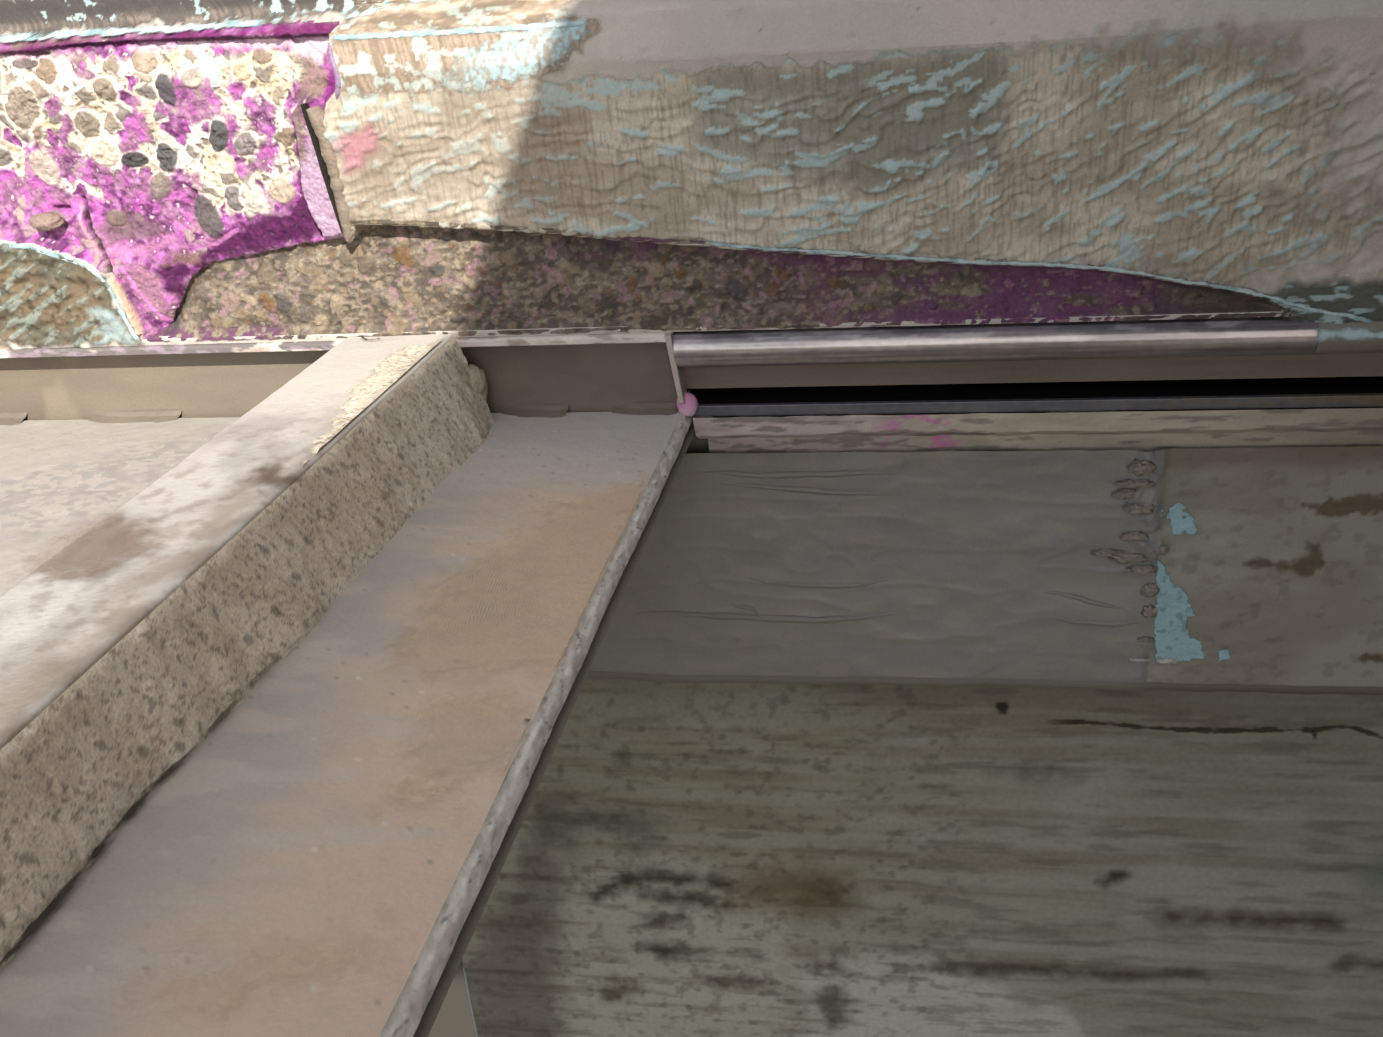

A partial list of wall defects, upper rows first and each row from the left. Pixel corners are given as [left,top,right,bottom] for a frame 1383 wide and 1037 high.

peeling [0,0,1383,348]
peeling [1090,458,1230,664]
crack [1062,720,1383,739]